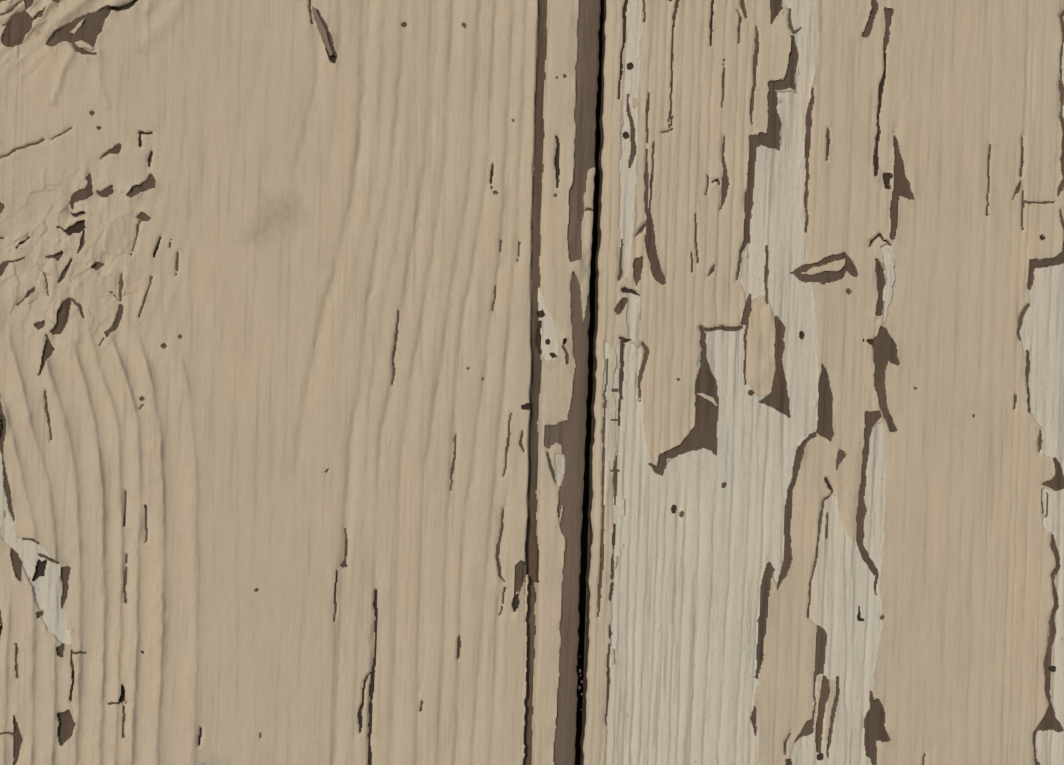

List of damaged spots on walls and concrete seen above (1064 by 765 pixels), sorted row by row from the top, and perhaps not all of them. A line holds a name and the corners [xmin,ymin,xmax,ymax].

peeling [1,0,34,47]
peeling [46,0,138,55]
peeling [56,173,156,245]
peeling [0,393,76,746]
peeling [35,298,71,335]
peeling [104,273,124,337]
peeling [536,0,601,765]
peeling [600,0,858,765]
peeling [784,131,914,765]
peeling [1017,209,1064,765]
peeling [0,715,23,765]
crack [358,589,378,765]